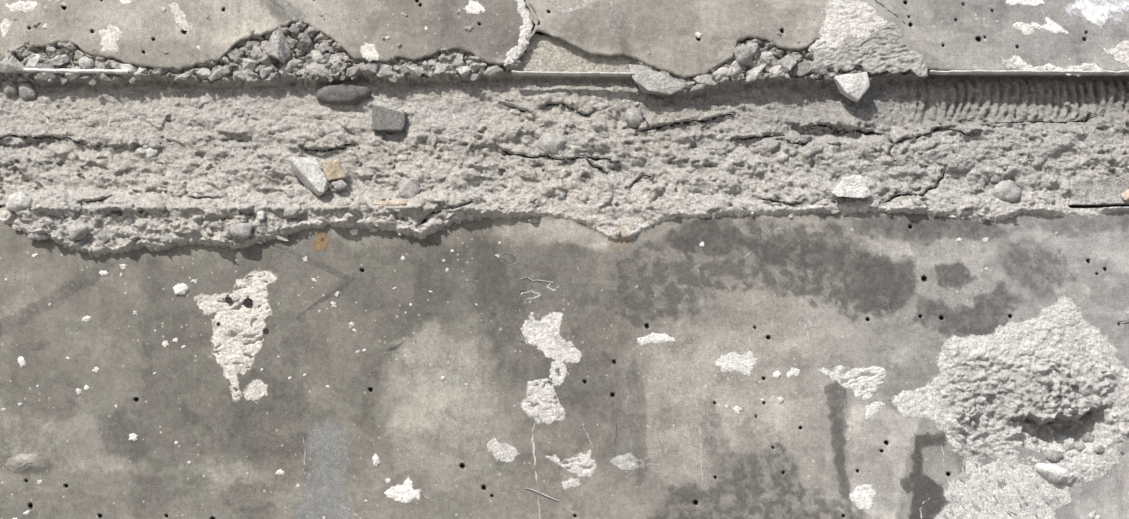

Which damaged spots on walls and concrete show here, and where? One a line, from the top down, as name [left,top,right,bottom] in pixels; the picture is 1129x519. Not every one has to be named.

peeling [98,24,124,53]
peeling [360,42,379,62]
crack [516,0,538,56]
water stain [617,218,914,326]
water stain [935,263,970,286]
peeling [193,270,278,403]
peeling [521,312,581,363]
water stain [915,286,1013,336]
peeling [513,378,566,424]
spalling [818,294,1129,519]
water stain [660,383,863,519]
water stain [901,432,947,519]